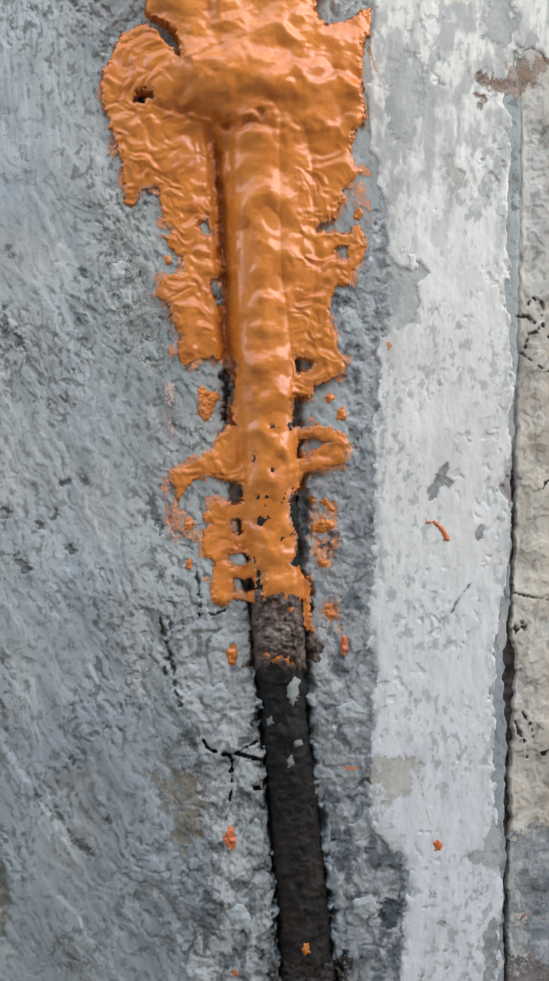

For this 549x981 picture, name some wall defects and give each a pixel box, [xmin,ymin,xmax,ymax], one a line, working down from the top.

peeling [479,0,520,49]
peeling [382,49,426,143]
crack [517,297,549,372]
spalling [427,462,454,501]
crack [159,618,182,708]
crack [195,572,225,617]
rust [240,589,325,672]
peeling [496,598,525,652]
crack [502,469,549,848]
crack [202,739,263,801]
peeling [483,918,499,981]
crack [500,871,508,981]